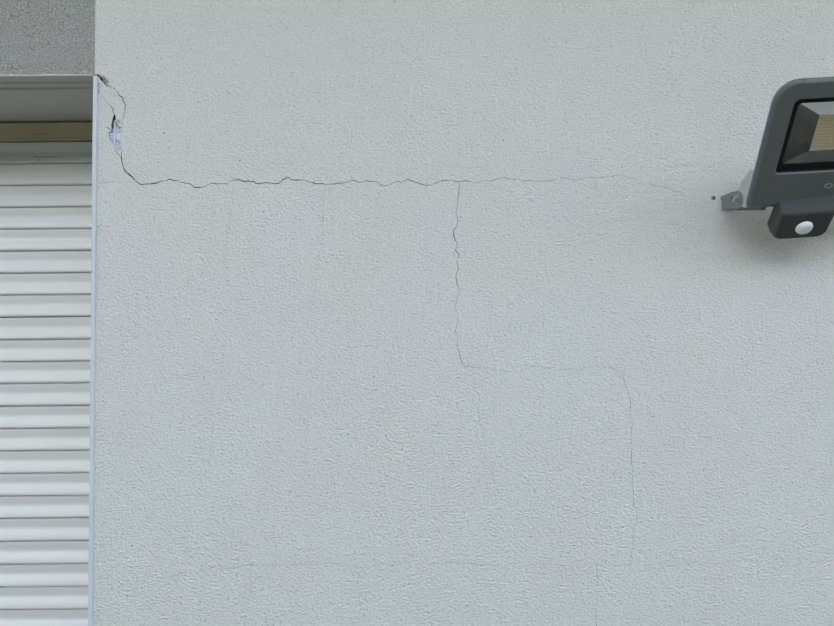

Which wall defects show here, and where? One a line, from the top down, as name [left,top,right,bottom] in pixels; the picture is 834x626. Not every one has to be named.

crack [97,75,684,391]
crack [536,365,708,590]